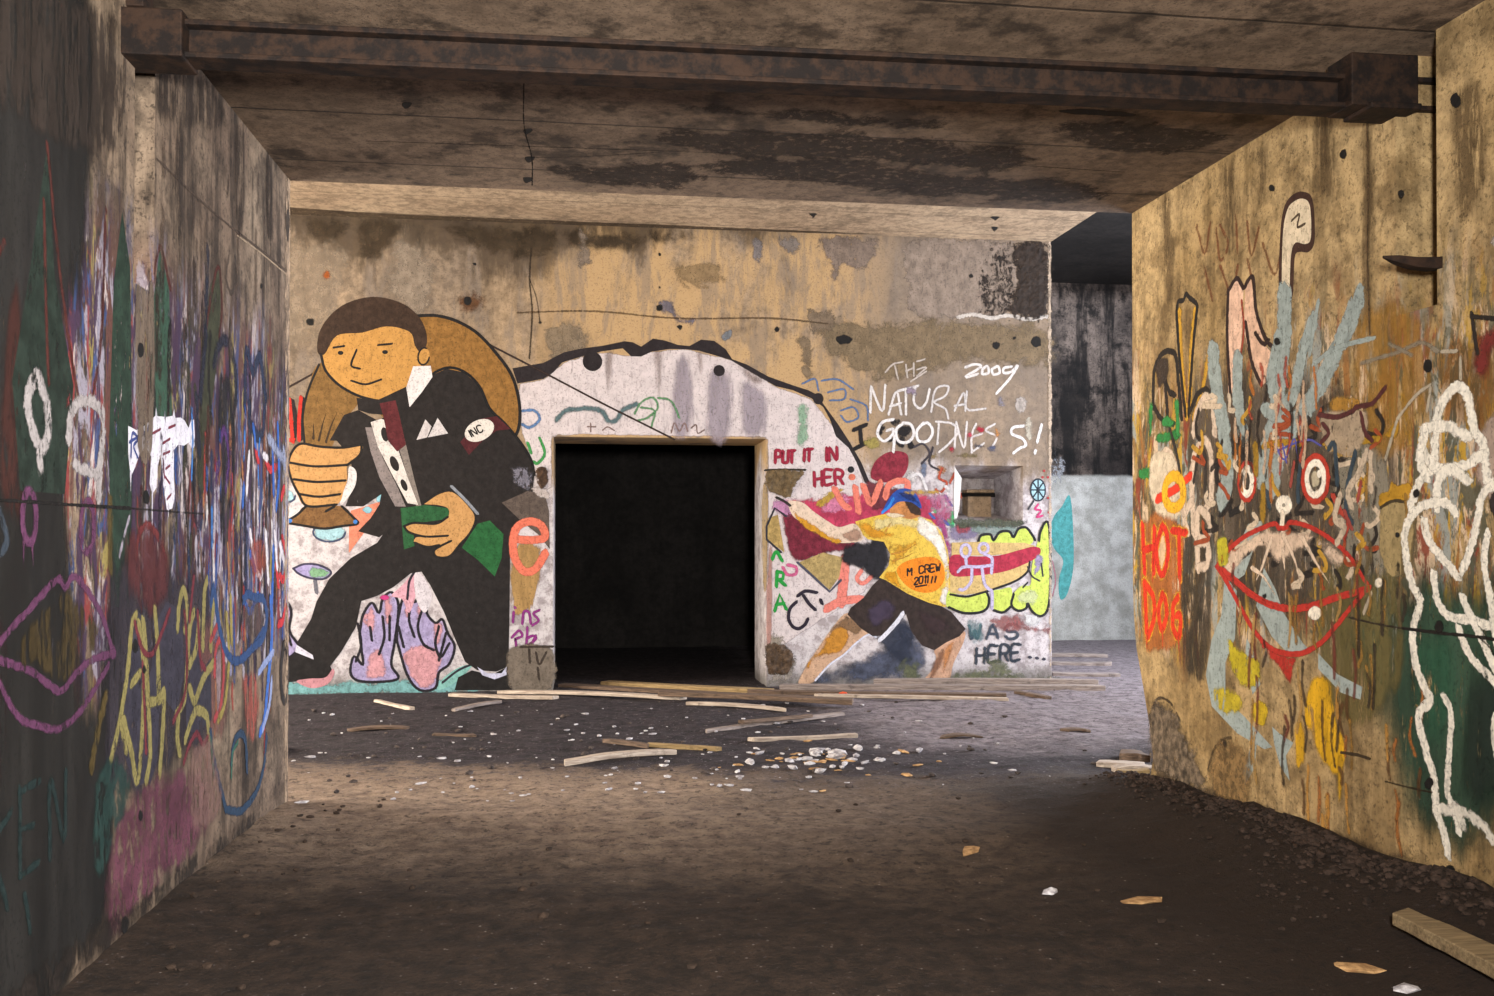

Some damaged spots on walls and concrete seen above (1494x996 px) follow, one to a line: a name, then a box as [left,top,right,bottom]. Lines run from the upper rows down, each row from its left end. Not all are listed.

water stain [547,104,1109,204]
water stain [290,207,861,266]
peeling [545,322,588,358]
peeling [797,216,1054,678]